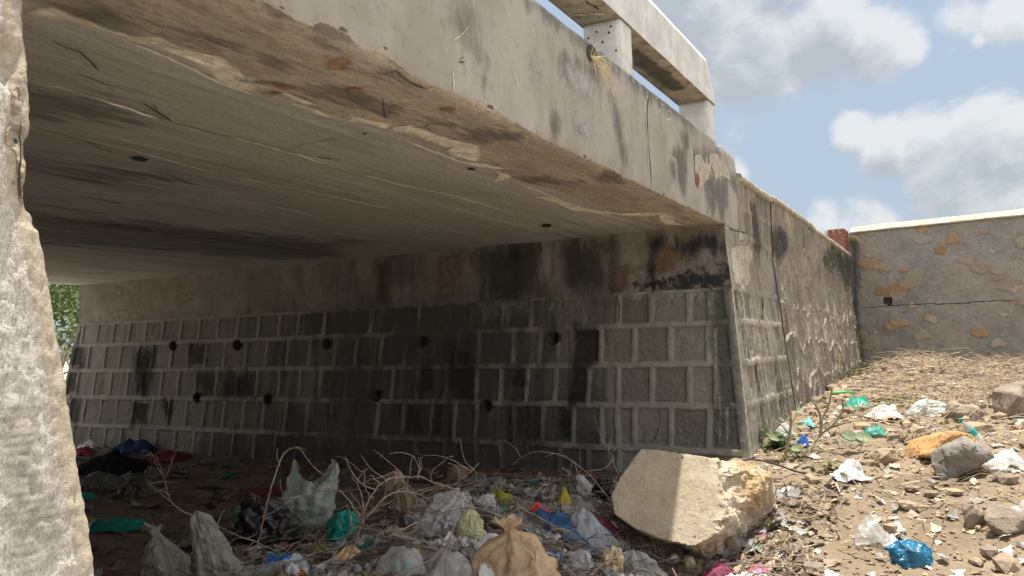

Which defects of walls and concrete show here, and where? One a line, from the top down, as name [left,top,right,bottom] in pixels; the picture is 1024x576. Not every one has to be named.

crack [53,41,112,87]
rust [256,81,296,94]
flaking render [695,146,731,188]
leakage [535,197,726,265]
crack [863,300,1018,308]
leakage [130,402,148,428]